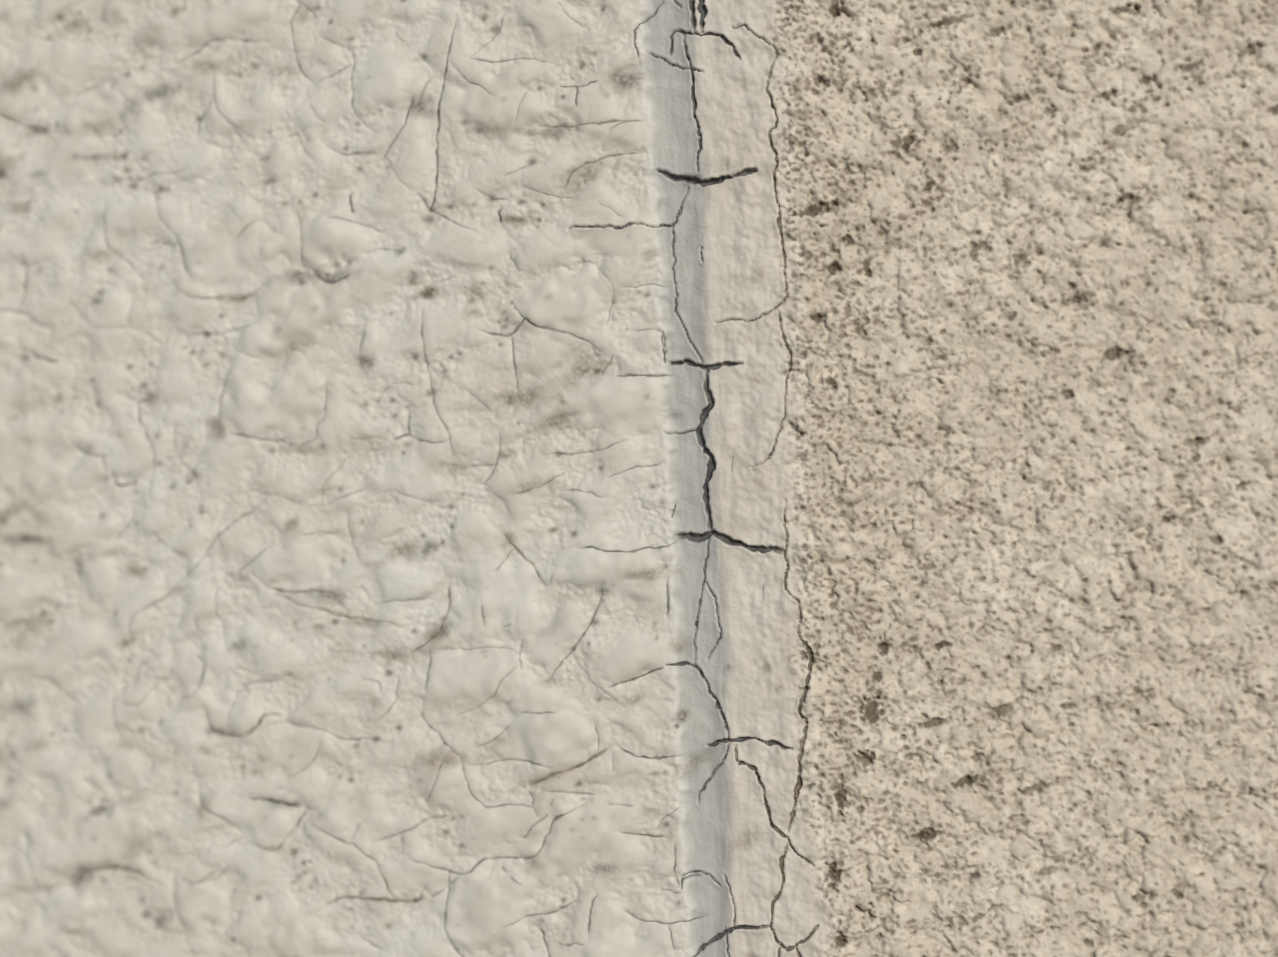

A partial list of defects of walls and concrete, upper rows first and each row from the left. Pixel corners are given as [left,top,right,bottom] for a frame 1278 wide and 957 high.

crack [406,30,533,220]
crack [490,312,541,369]
crack [219,393,326,443]
crack [572,0,816,957]
crack [255,576,351,618]
crack [419,592,451,685]
crack [266,799,403,902]
crack [431,750,668,874]
crack [513,898,595,957]